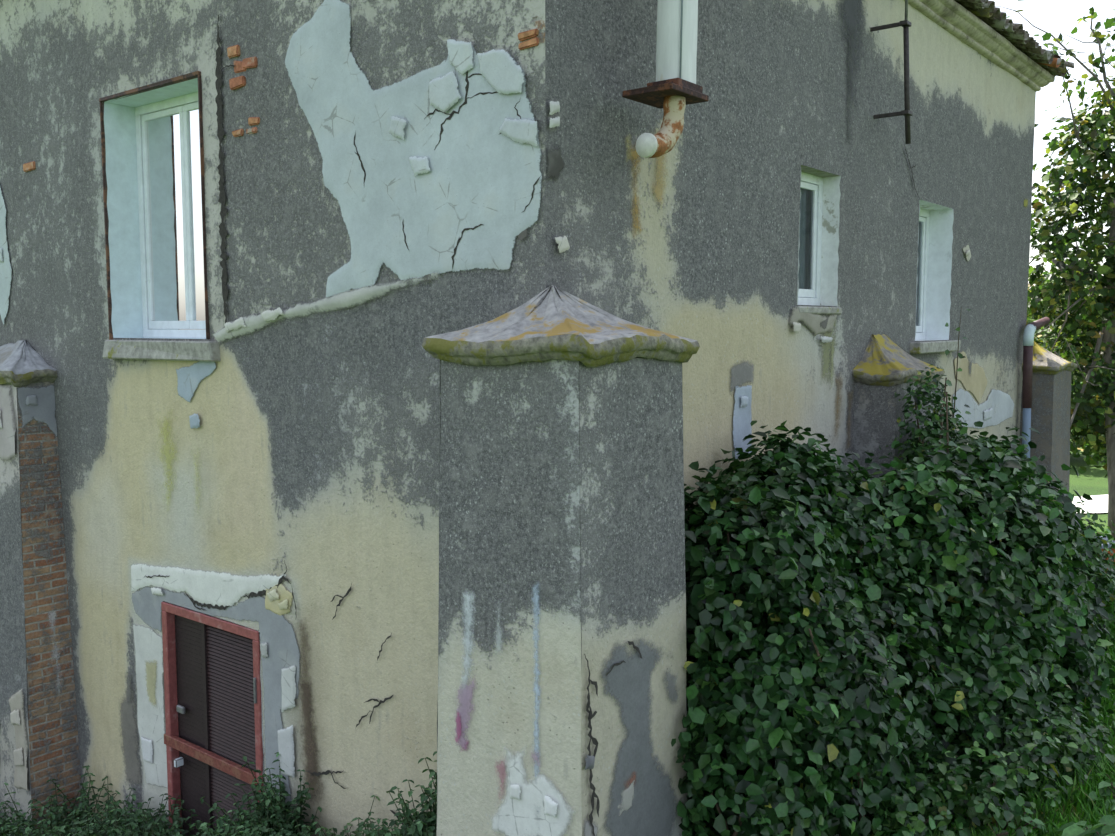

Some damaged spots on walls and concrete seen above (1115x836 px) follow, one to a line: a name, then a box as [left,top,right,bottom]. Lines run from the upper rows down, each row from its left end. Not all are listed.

flaking render [227,45,258,90]
damp [841,0,863,137]
flaking render [232,117,260,137]
crack [354,132,366,183]
crack [425,70,539,150]
flaking render [0,188,12,324]
crack [451,224,483,269]
flaking render [0,384,38,460]
flaking render [176,361,216,429]
flaking render [132,584,300,806]
crack [355,695,393,729]
crack [585,656,600,836]